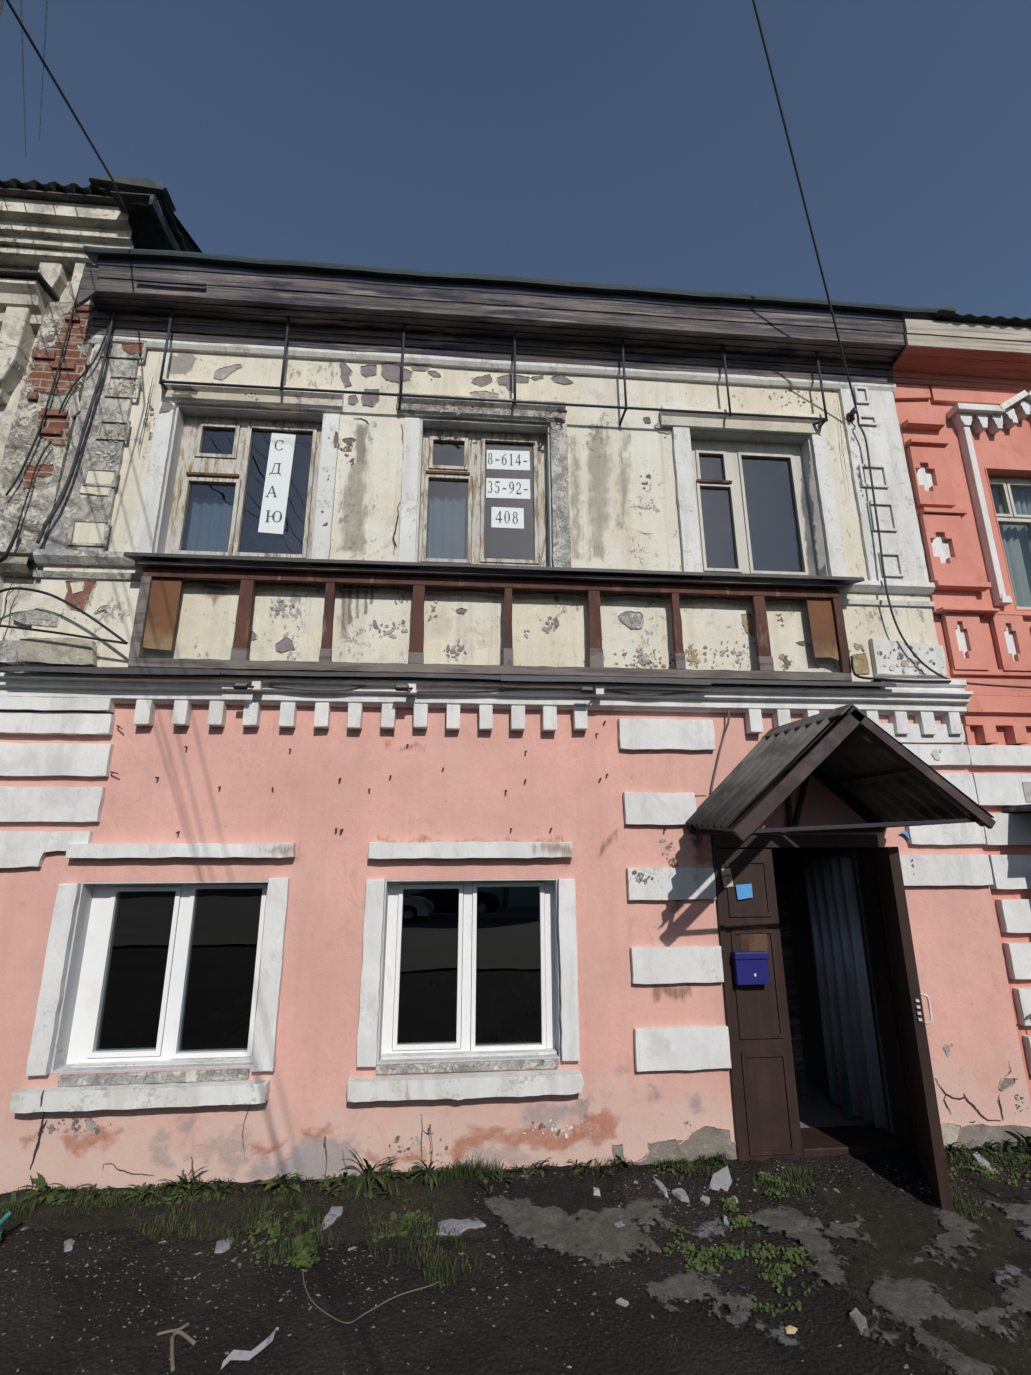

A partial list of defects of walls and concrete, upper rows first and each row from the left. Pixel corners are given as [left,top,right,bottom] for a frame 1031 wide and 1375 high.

flaking render [17,305,98,447]
peeling [213,364,243,381]
peeling [336,360,442,407]
peeling [421,374,573,415]
peeling [275,636,296,659]
peeling [370,619,408,638]
peeling [444,639,467,662]
peeling [618,595,662,630]
peeling [614,613,756,668]
peeling [779,641,808,671]
crack [935,1064,1014,1123]
flaking render [372,1114,737,1165]